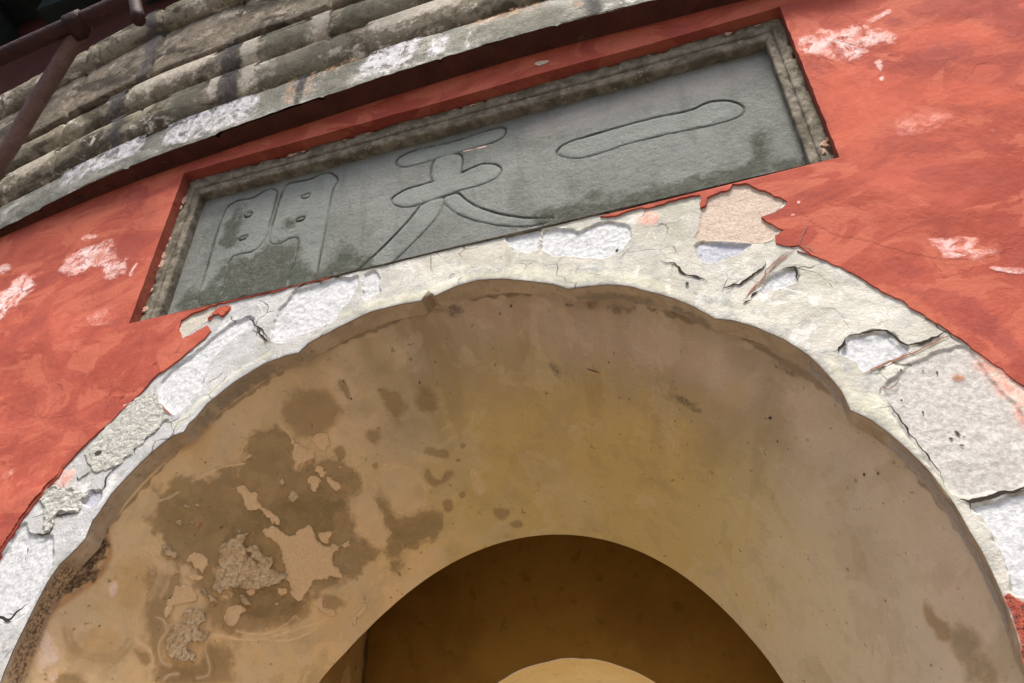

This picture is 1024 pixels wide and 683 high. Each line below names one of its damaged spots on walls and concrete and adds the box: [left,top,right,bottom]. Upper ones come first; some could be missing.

crack [220,292,271,344]
spalling [271,271,381,343]
spalling [506,222,631,258]
crack [660,225,818,304]
peeling [696,185,783,263]
spalling [760,271,798,293]
spalling [158,305,255,415]
crack [838,329,1024,507]
leakage [152,427,442,621]
peeling [291,432,341,492]
spalling [840,332,1024,664]
peeling [161,485,351,663]